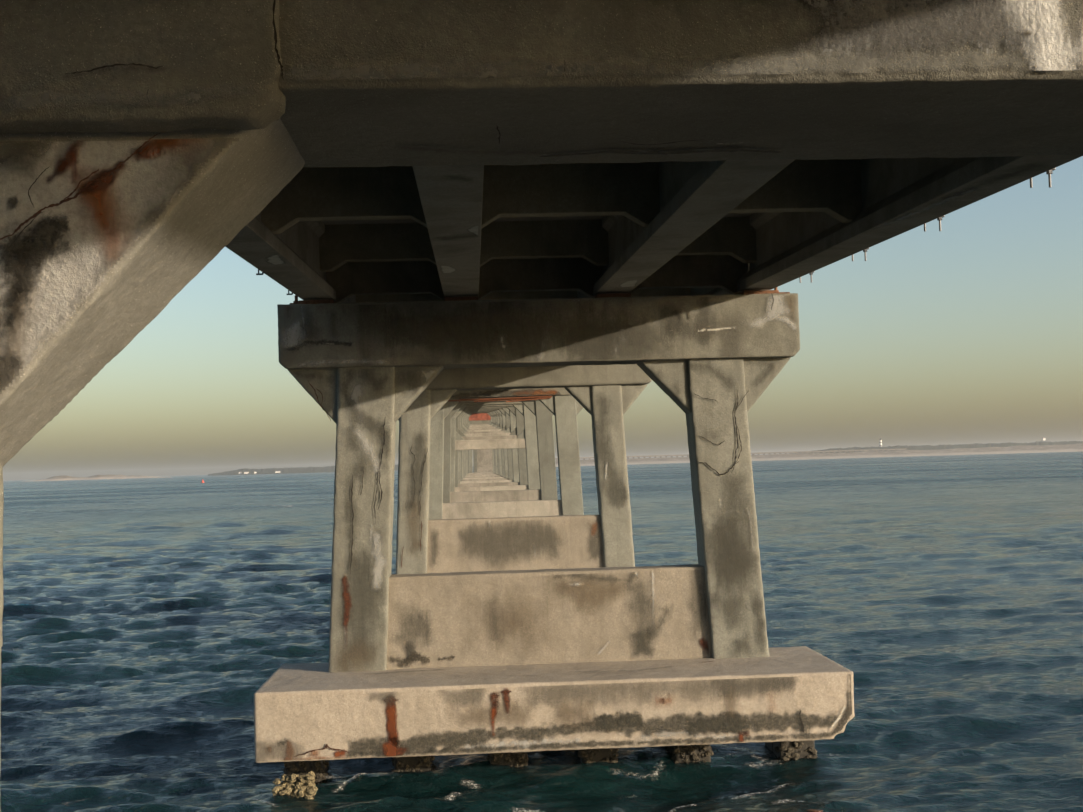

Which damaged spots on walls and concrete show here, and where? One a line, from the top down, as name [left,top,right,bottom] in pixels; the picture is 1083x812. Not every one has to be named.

crack [65,63,162,74]
crack [272,0,284,80]
crack [0,133,160,240]
corrosion [47,139,185,253]
damp [0,139,214,370]
crack [695,392,748,475]
crack [350,417,386,574]
damp [462,523,556,561]
corrosion [342,576,352,639]
corrosion [383,695,406,756]
corrosion [491,689,511,735]
damp [349,712,837,756]